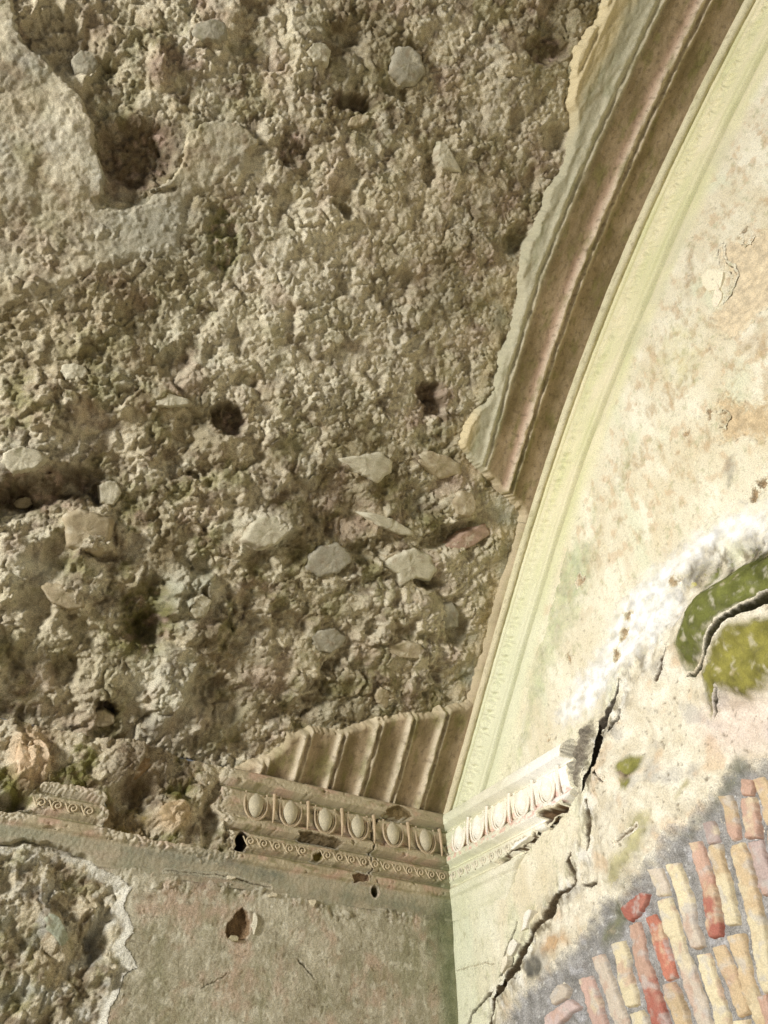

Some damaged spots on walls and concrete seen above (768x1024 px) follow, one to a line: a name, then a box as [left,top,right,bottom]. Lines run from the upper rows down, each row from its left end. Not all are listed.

spalling [95,107,183,202]
spalling [270,114,318,181]
spalling [200,201,248,287]
peeling [701,224,768,345]
spalling [0,462,116,518]
spalling [113,579,186,661]
water stain [557,512,766,722]
spalling [0,718,234,852]
spalling [544,717,599,796]
crack [456,676,638,1024]
spalling [0,841,138,1024]
spalling [223,904,258,945]